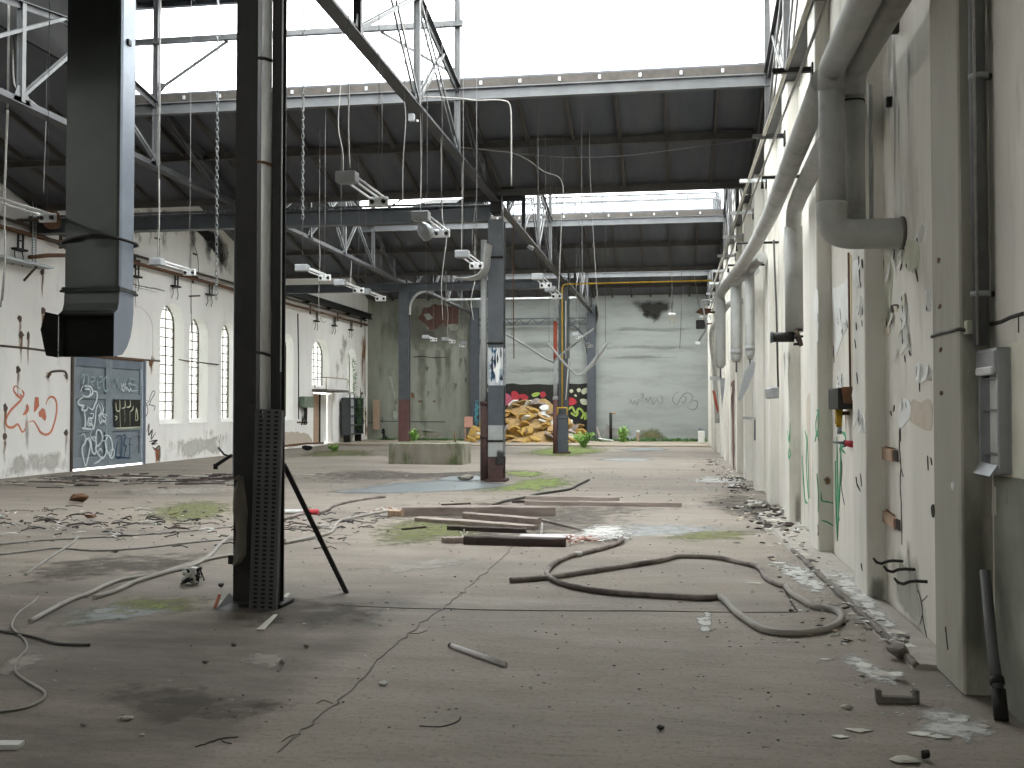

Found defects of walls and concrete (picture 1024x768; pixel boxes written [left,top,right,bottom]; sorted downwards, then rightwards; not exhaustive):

flaking render [418,304,459,331]
spalling [881,219,943,442]
water stain [329,471,480,479]
water stain [616,524,714,536]
crack [277,546,798,752]